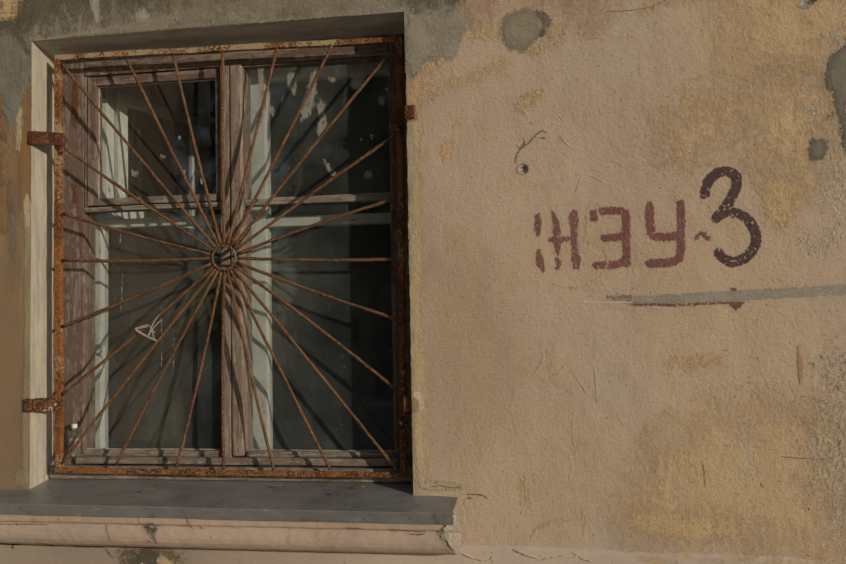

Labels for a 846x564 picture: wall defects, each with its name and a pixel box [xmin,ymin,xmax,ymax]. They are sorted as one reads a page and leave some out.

water stain [0,0,228,85]
peeling [406,74,463,492]